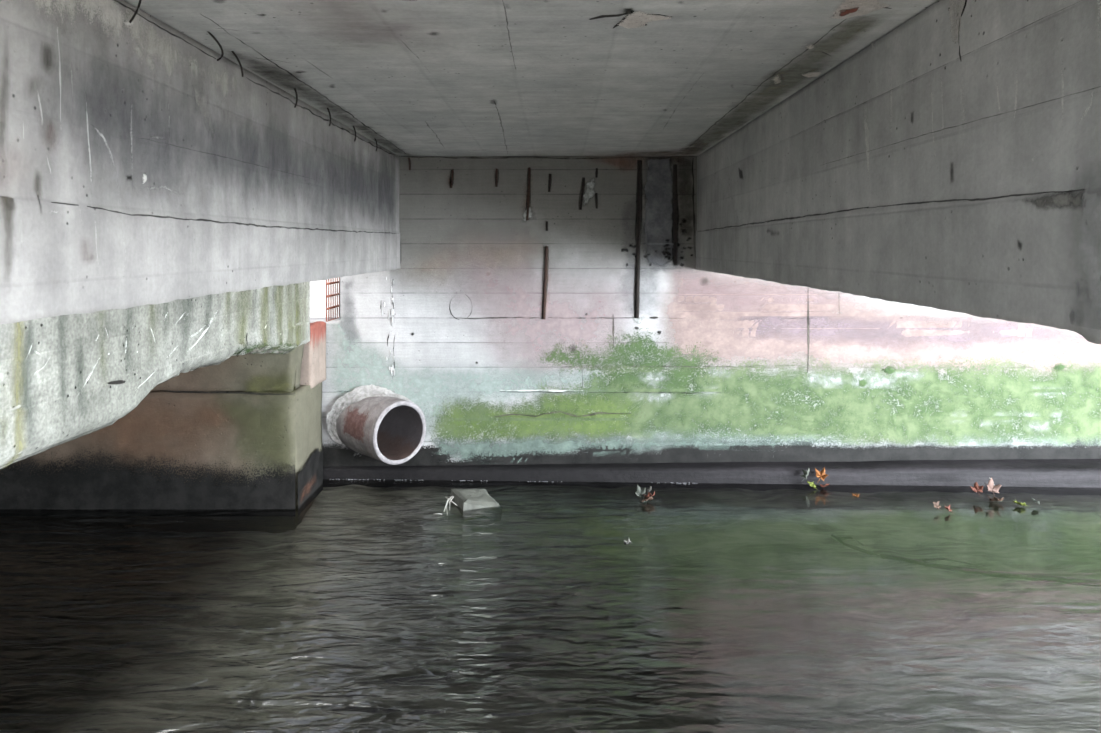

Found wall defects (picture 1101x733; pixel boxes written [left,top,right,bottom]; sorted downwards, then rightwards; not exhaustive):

crack [114,0,216,59]
spalling [589,9,671,29]
spalling [831,0,892,19]
crack [202,15,600,159]
leakage [80,78,176,171]
crack [629,21,1085,234]
leakage [2,196,13,227]
crack [51,202,401,265]
leakage [210,130,394,216]
spalling [1027,190,1084,208]
leakage [262,287,300,350]
leakage [0,322,1101,517]